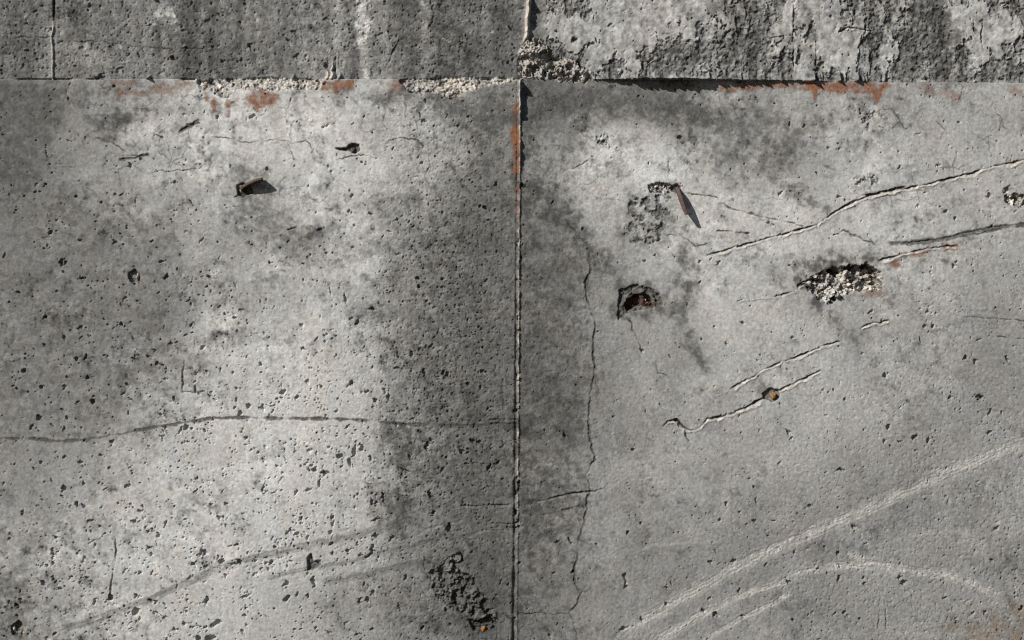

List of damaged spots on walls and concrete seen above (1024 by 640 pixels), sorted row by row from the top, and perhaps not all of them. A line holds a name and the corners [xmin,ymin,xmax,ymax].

corrosion [248,90,277,110]
corrosion [321,80,353,93]
corrosion [721,81,887,99]
corrosion [510,103,520,173]
crack [667,159,1024,263]
spalling [802,263,882,303]
crack [862,320,889,329]
crack [663,341,840,441]
crack [525,227,599,635]